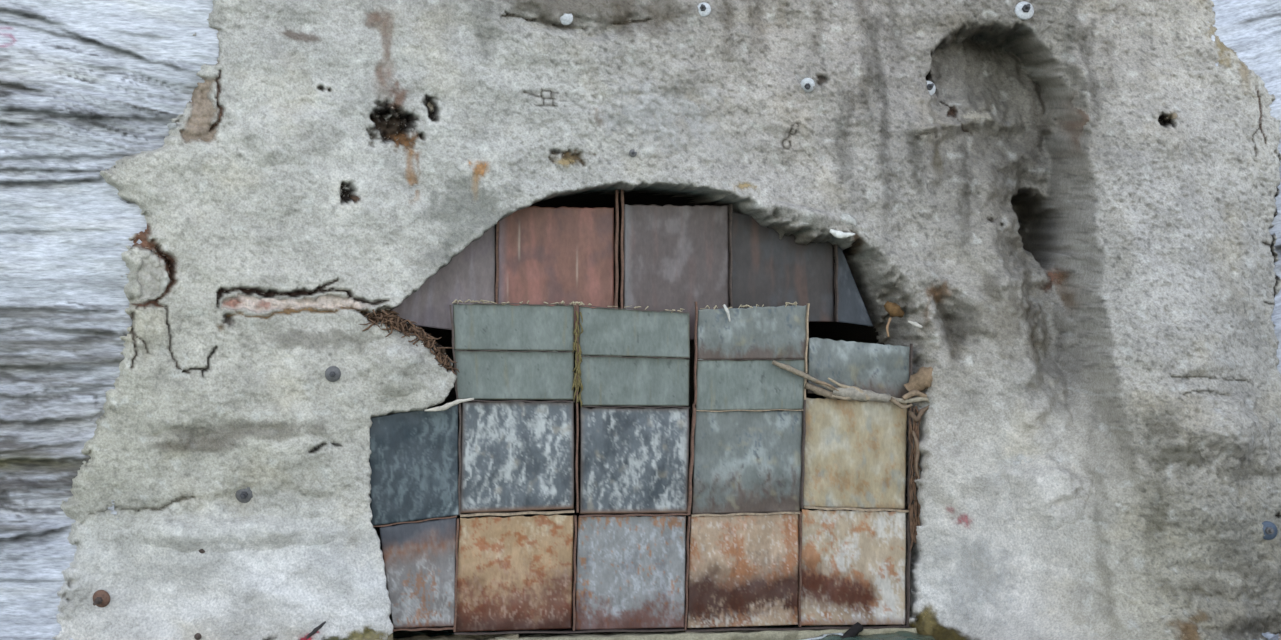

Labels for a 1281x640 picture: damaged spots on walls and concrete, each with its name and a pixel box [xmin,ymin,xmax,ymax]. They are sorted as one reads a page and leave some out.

spalling [167,61,223,142]
spalling [370,97,437,149]
crack [216,280,388,307]
crack [130,306,217,377]